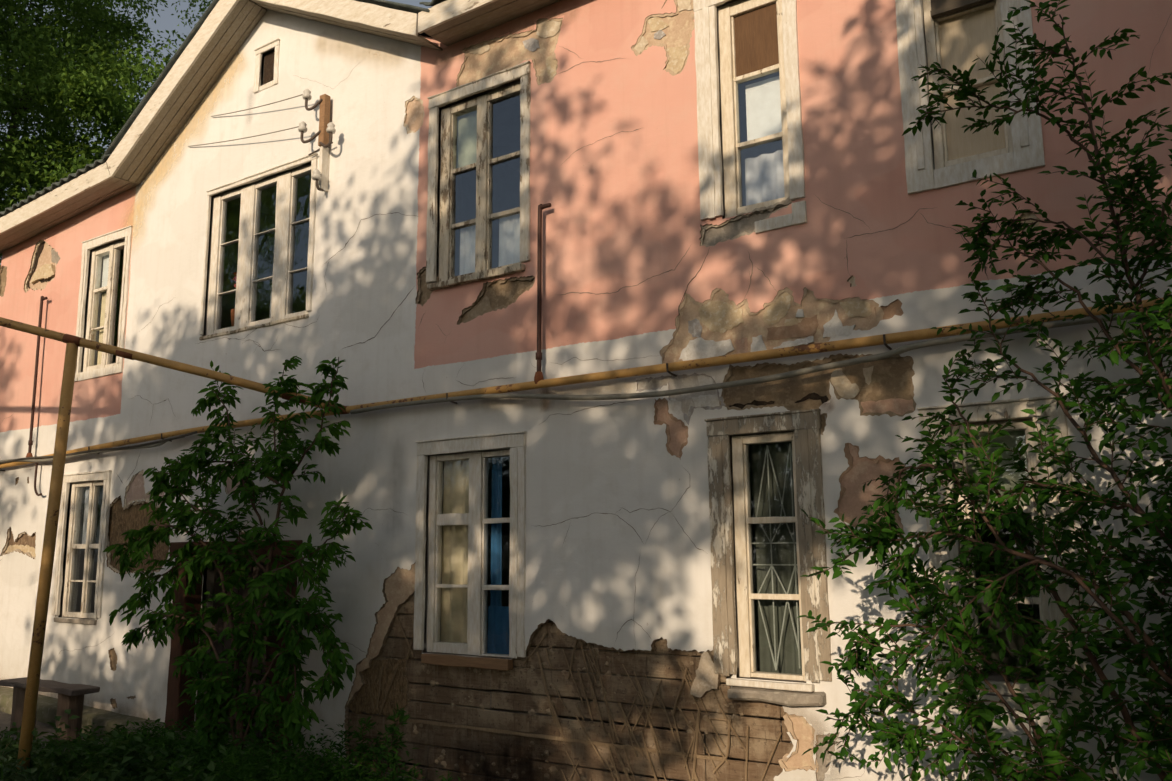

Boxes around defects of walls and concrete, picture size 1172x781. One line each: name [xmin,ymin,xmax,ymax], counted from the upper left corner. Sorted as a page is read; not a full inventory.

peeling [456,18,563,87]
flaking render [25,240,60,292]
crack [196,212,420,352]
crack [345,291,445,348]
crack [562,245,709,323]
flaking render [700,196,795,247]
peeling [636,276,916,458]
flaking render [2,529,36,559]
flaking render [107,470,170,574]
crack [538,469,708,646]
peeling [834,443,906,543]
flaking render [347,564,840,781]